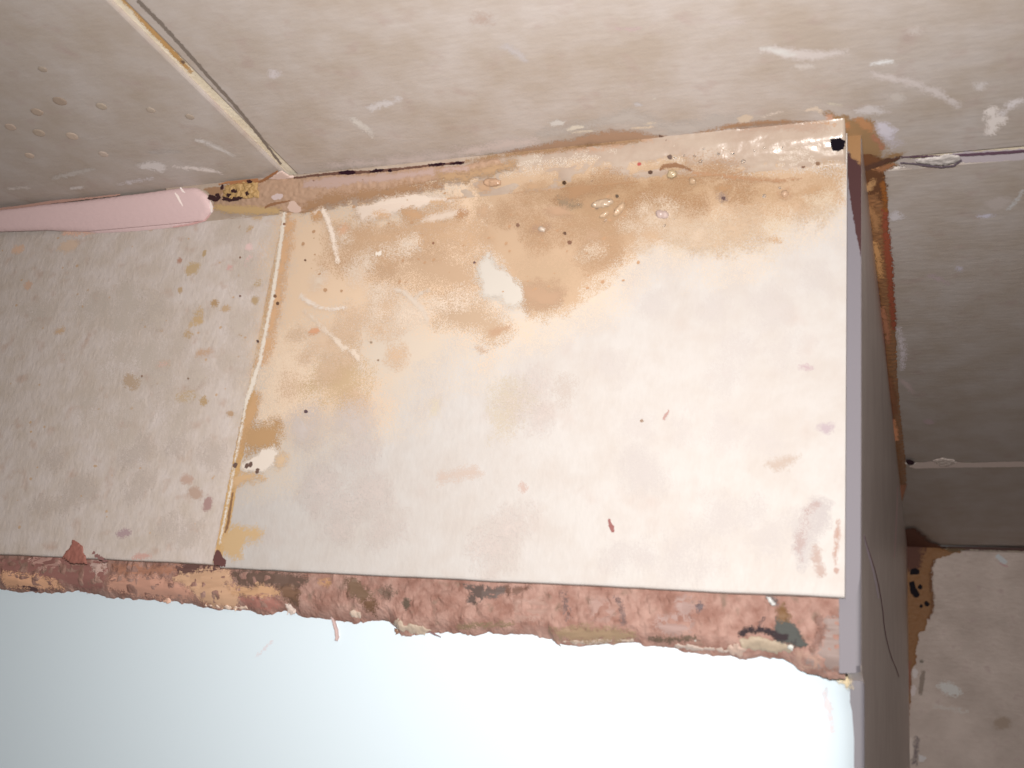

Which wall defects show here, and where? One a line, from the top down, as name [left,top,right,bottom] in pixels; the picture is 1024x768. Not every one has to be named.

damp [115,97,861,508]
rust [821,110,906,345]
peeling [0,540,845,679]